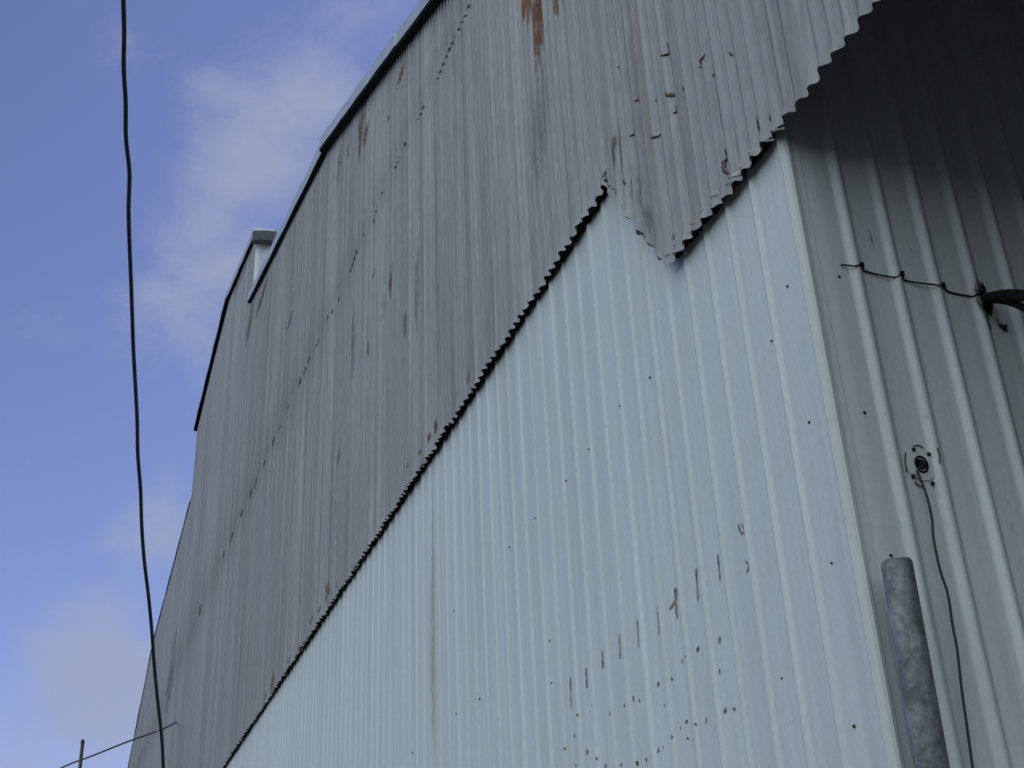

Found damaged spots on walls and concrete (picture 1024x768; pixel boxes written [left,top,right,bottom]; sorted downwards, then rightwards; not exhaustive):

corrosion [521,0,559,58]